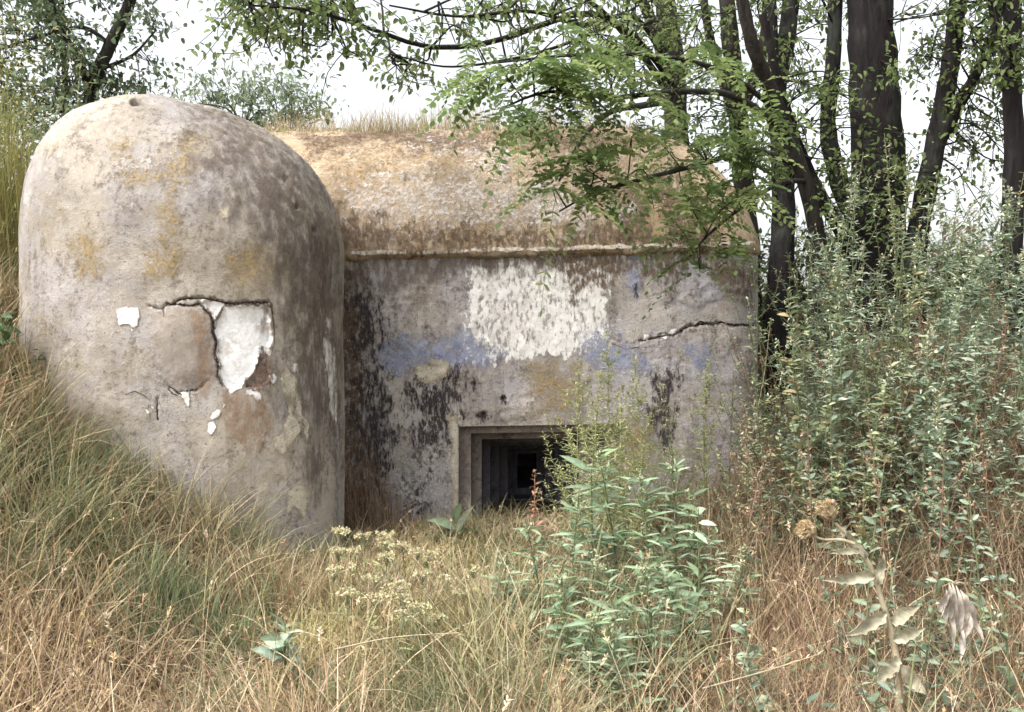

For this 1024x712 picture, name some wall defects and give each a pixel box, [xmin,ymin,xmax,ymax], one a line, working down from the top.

peeling [116,306,140,331]
spalling [198,299,310,455]
water stain [182,102,759,530]
peeling [351,243,687,391]
crack [612,321,757,349]